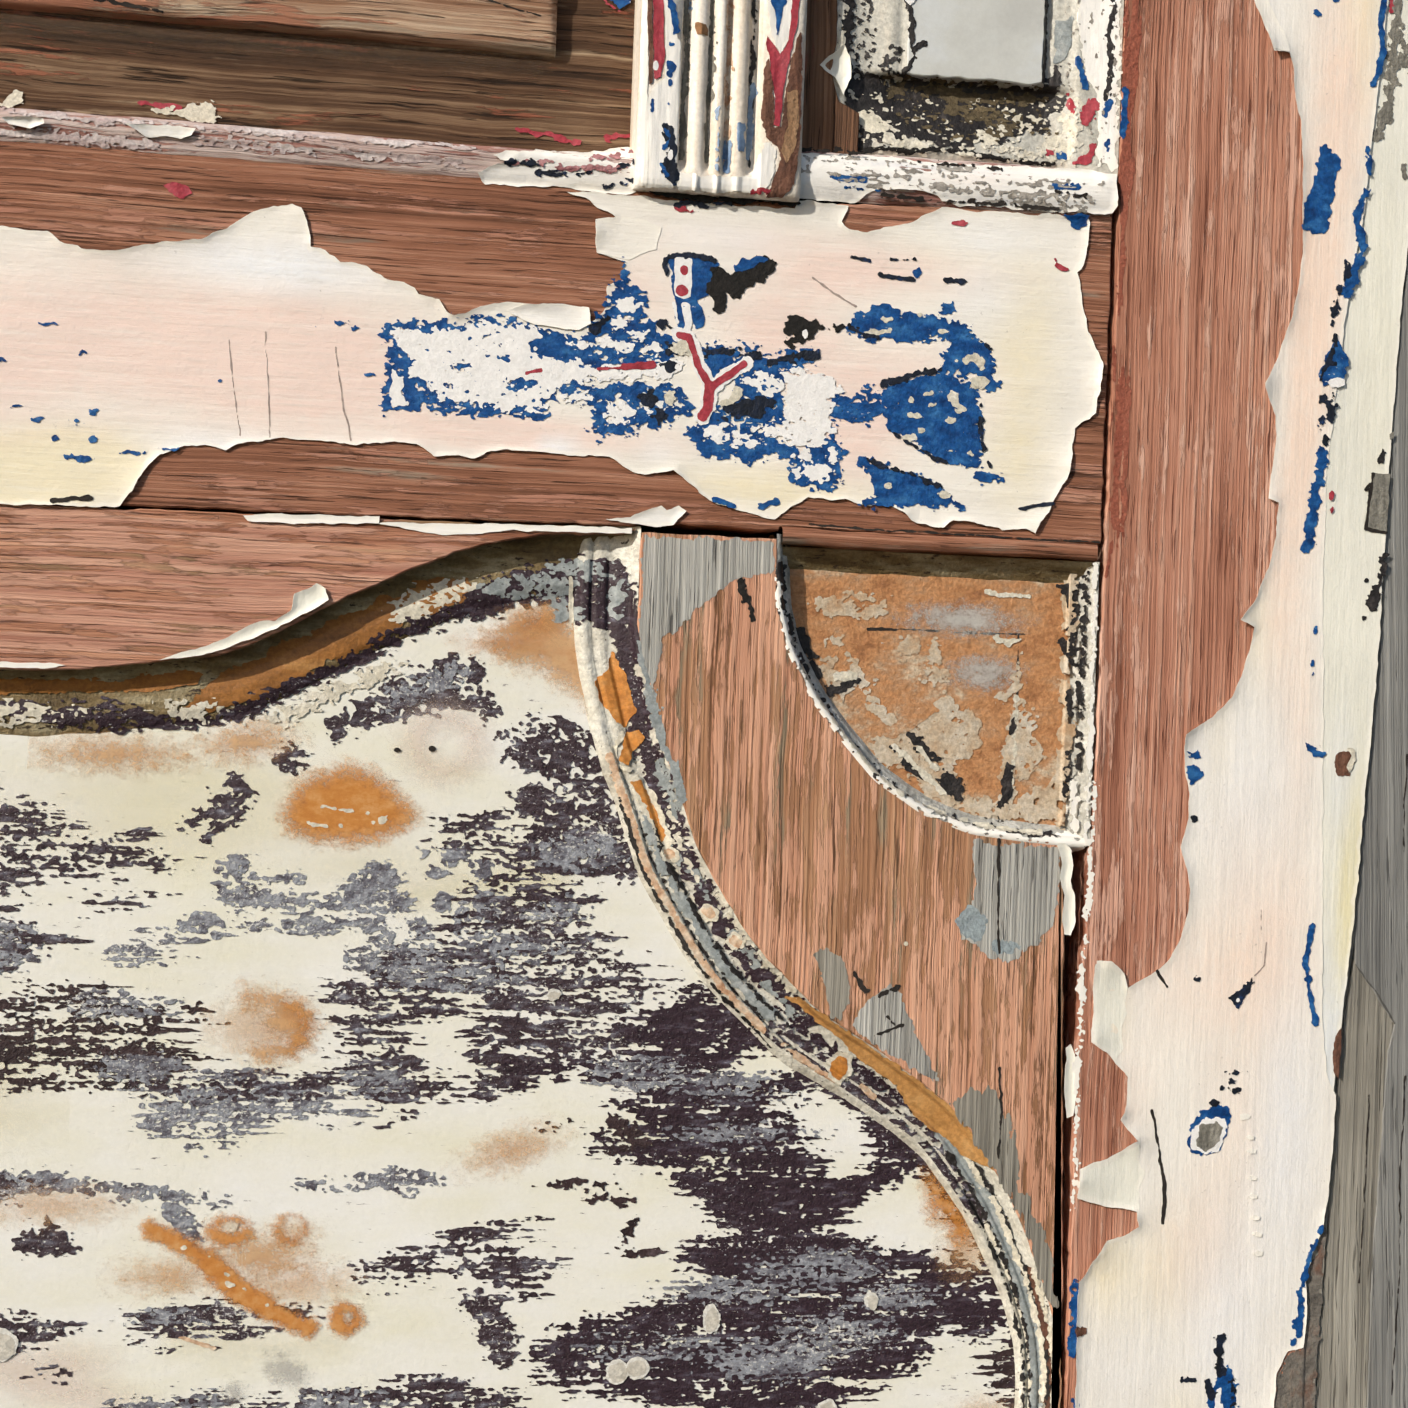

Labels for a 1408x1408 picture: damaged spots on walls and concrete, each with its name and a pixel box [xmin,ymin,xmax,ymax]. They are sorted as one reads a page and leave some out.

peeling [0,0,1123,533]
peeling [0,661,63,669]
peeling [161,583,329,660]
corrosion [282,765,415,844]
corrosion [491,605,680,863]
peeling [243,505,1100,963]
peeling [1064,0,1408,1408]
peeling [813,948,939,1081]
corrosion [141,1215,365,1338]
peeling [949,1085,1059,1308]